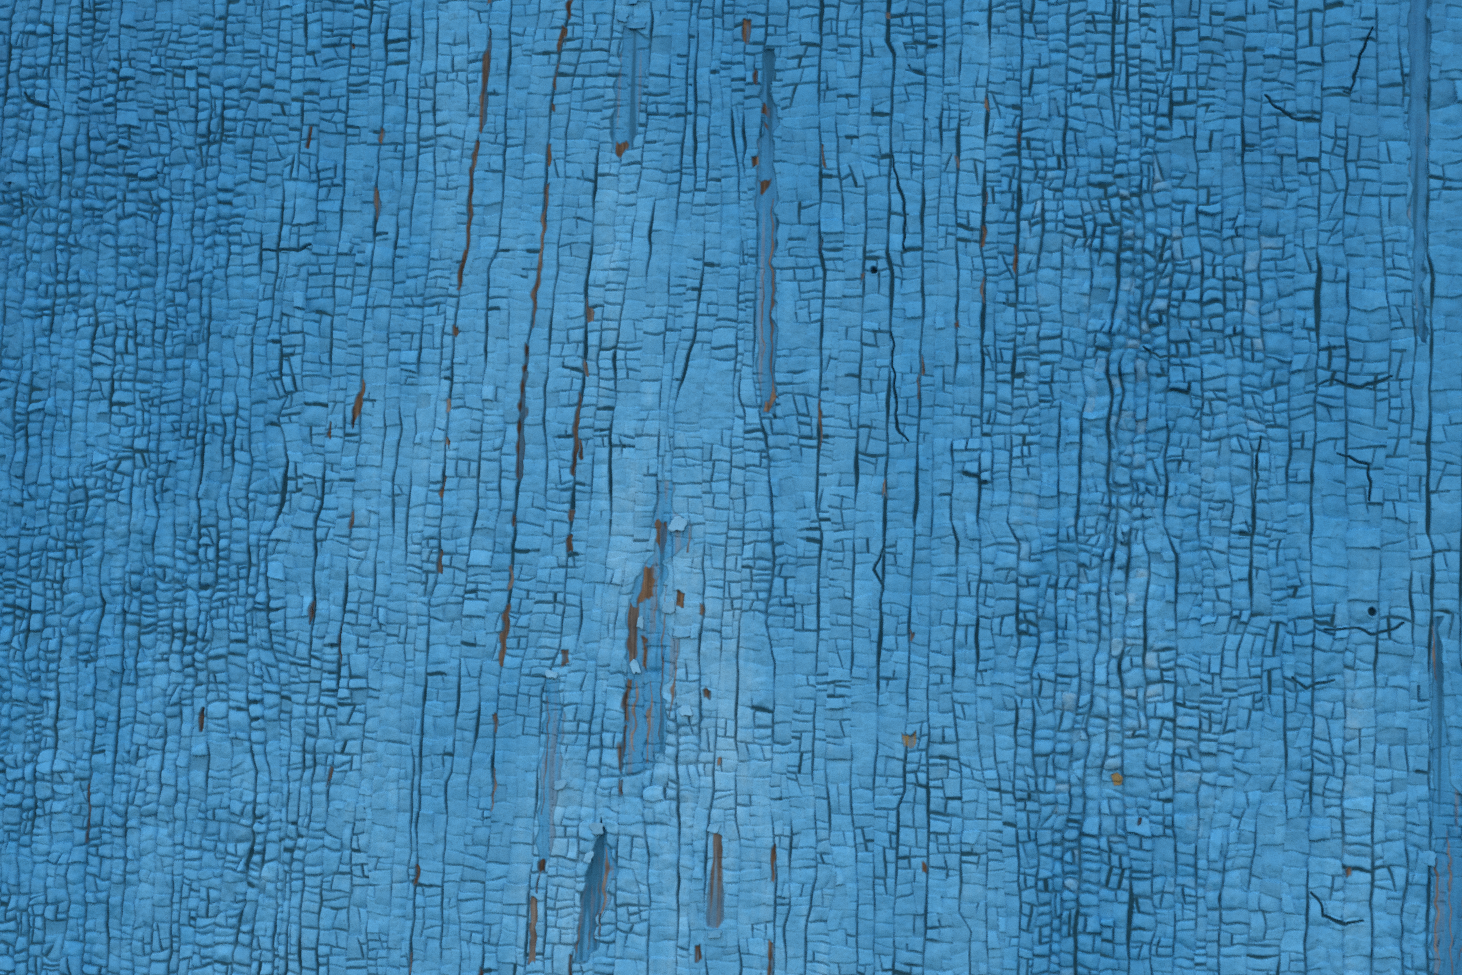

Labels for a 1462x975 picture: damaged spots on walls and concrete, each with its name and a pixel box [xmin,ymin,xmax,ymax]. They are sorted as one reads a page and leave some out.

crack [23,0,57,130]
crack [14,373,43,587]
crack [219,0,412,975]
crack [408,0,717,975]
crack [750,0,1032,975]
crack [1094,0,1452,825]
crack [80,591,109,843]
peeling [617,481,712,797]
peeling [574,818,620,963]
peeling [695,824,725,963]
crack [1125,862,1146,975]
crack [1310,892,1365,927]